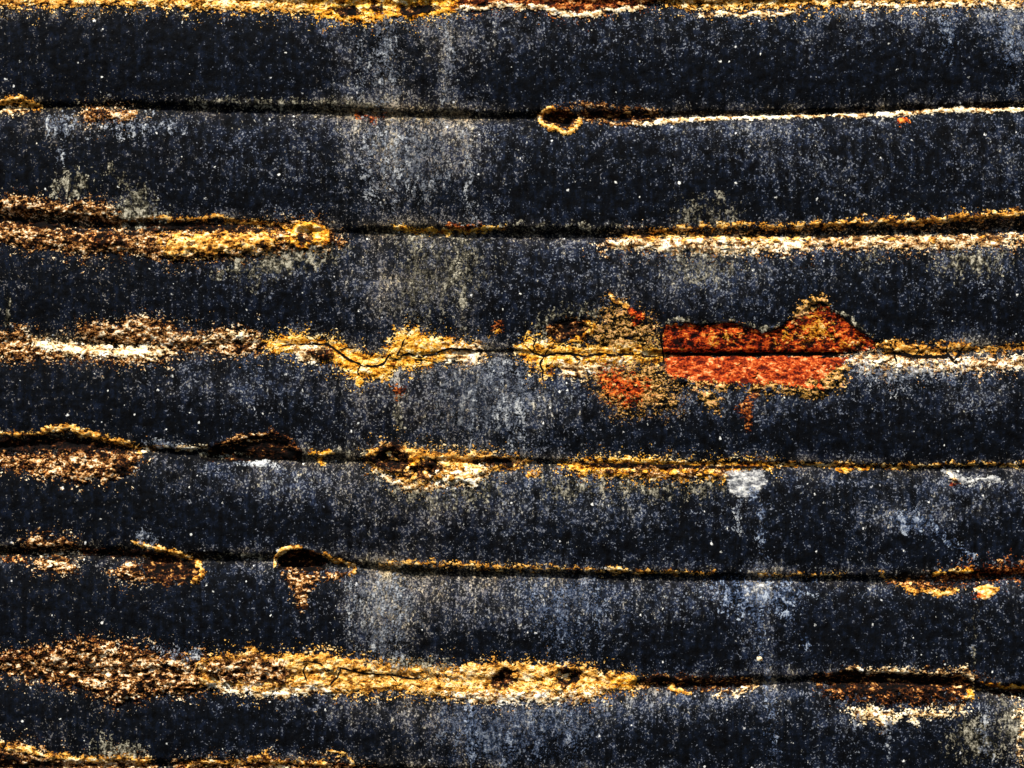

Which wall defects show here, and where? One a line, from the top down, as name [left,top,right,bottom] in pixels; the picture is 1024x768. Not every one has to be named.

peeling [582,190,829,292]
crack [274,339,662,378]
rust [0,308,1024,515]
peeling [832,690,956,719]